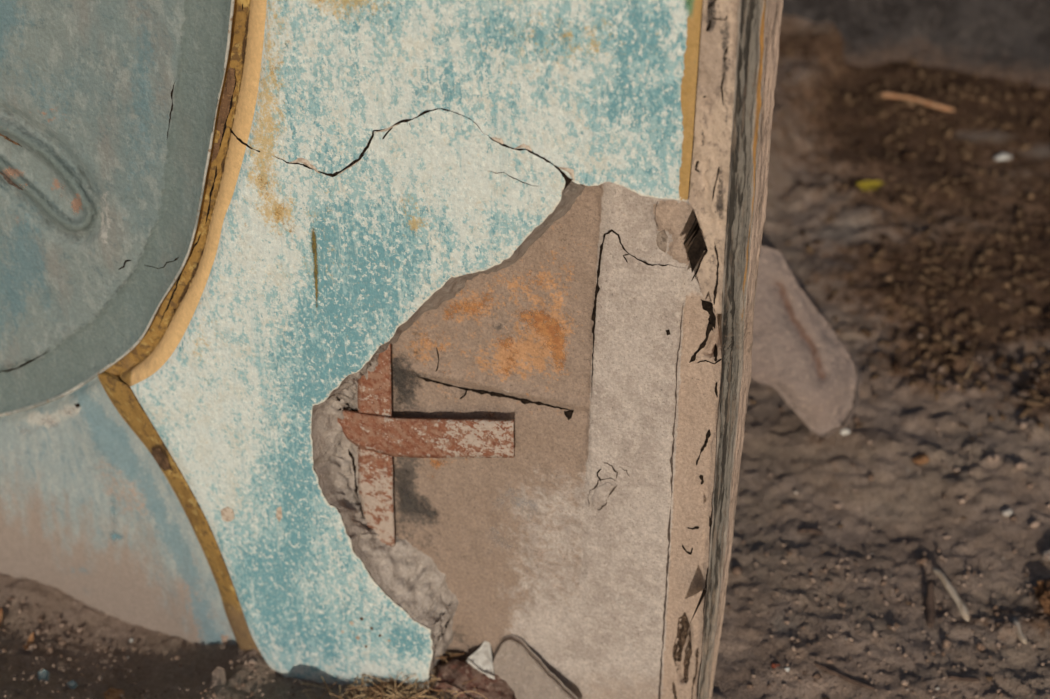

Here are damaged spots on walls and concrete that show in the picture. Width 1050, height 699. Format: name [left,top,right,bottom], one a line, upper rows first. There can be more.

crack [703,0,728,103]
crack [118,76,575,327]
crack [0,351,49,372]
corrosion [519,310,565,368]
crack [348,449,362,508]
flaking render [311,149,723,699]
crack [417,161,721,699]